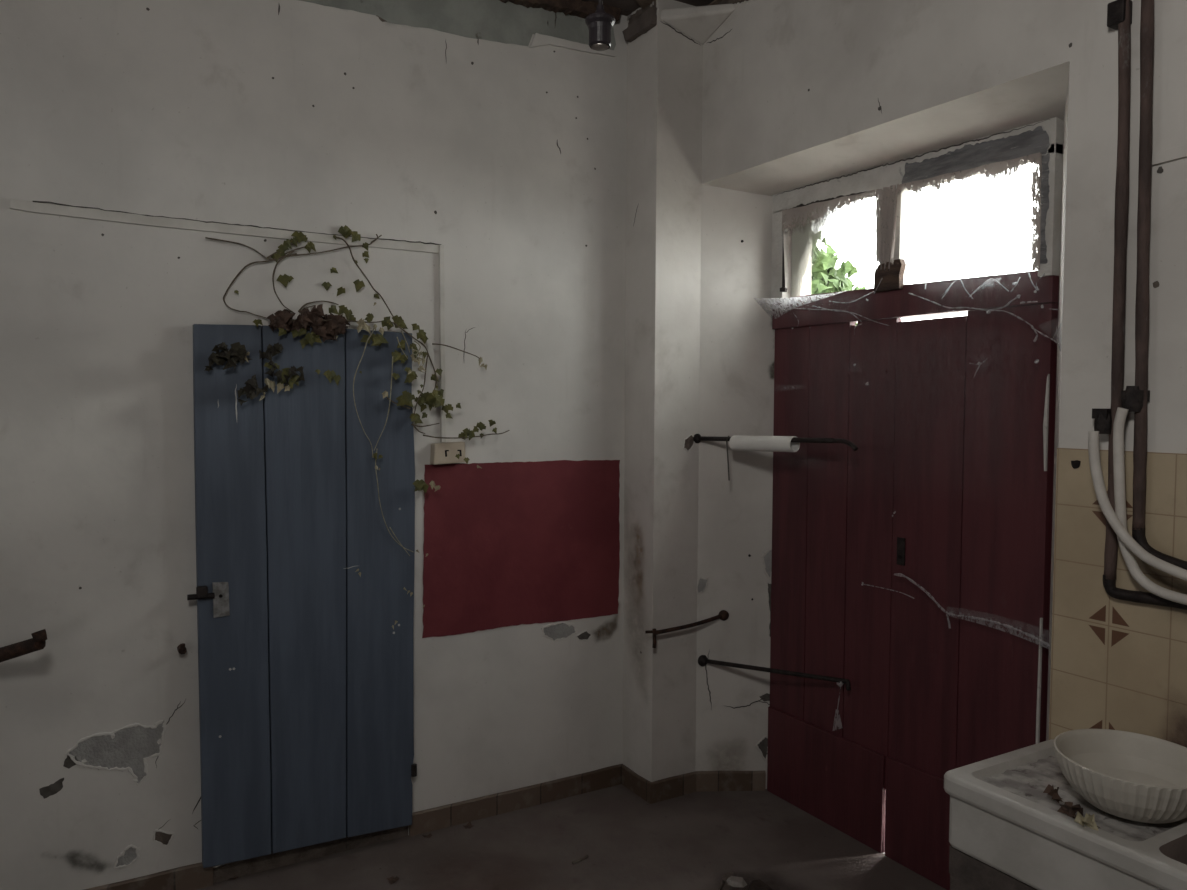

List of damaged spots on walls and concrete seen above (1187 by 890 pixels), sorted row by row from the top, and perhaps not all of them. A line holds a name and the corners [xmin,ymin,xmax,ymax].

flaking render [39,718,166,799]